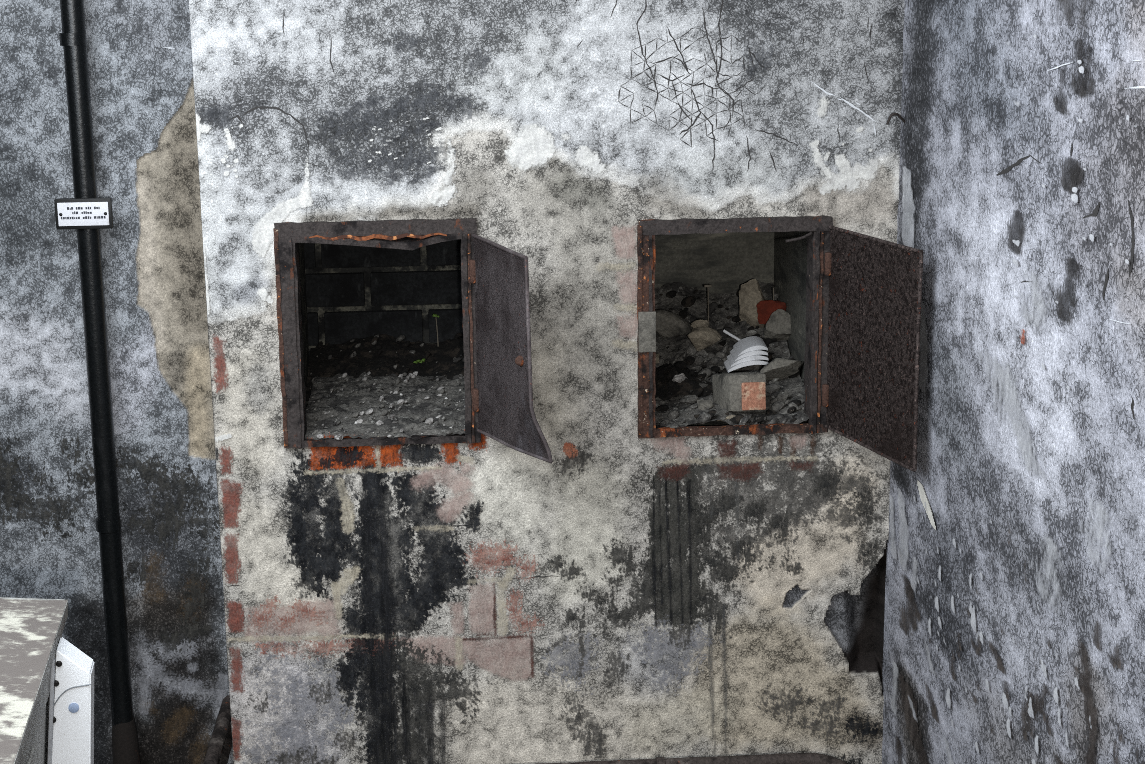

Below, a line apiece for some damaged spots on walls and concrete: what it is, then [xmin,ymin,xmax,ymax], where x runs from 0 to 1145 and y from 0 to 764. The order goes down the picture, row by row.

crack [611,0,795,172]
flaking render [132,75,249,584]
flaking render [252,158,313,260]
corrosion [309,233,447,241]
damp [1005,210,1024,255]
damp [1017,257,1080,328]
corrosion [293,434,487,477]
damp [116,442,227,715]
damp [239,485,445,764]
flaking render [227,540,545,692]
damp [541,417,889,764]
spalling [821,480,1122,764]